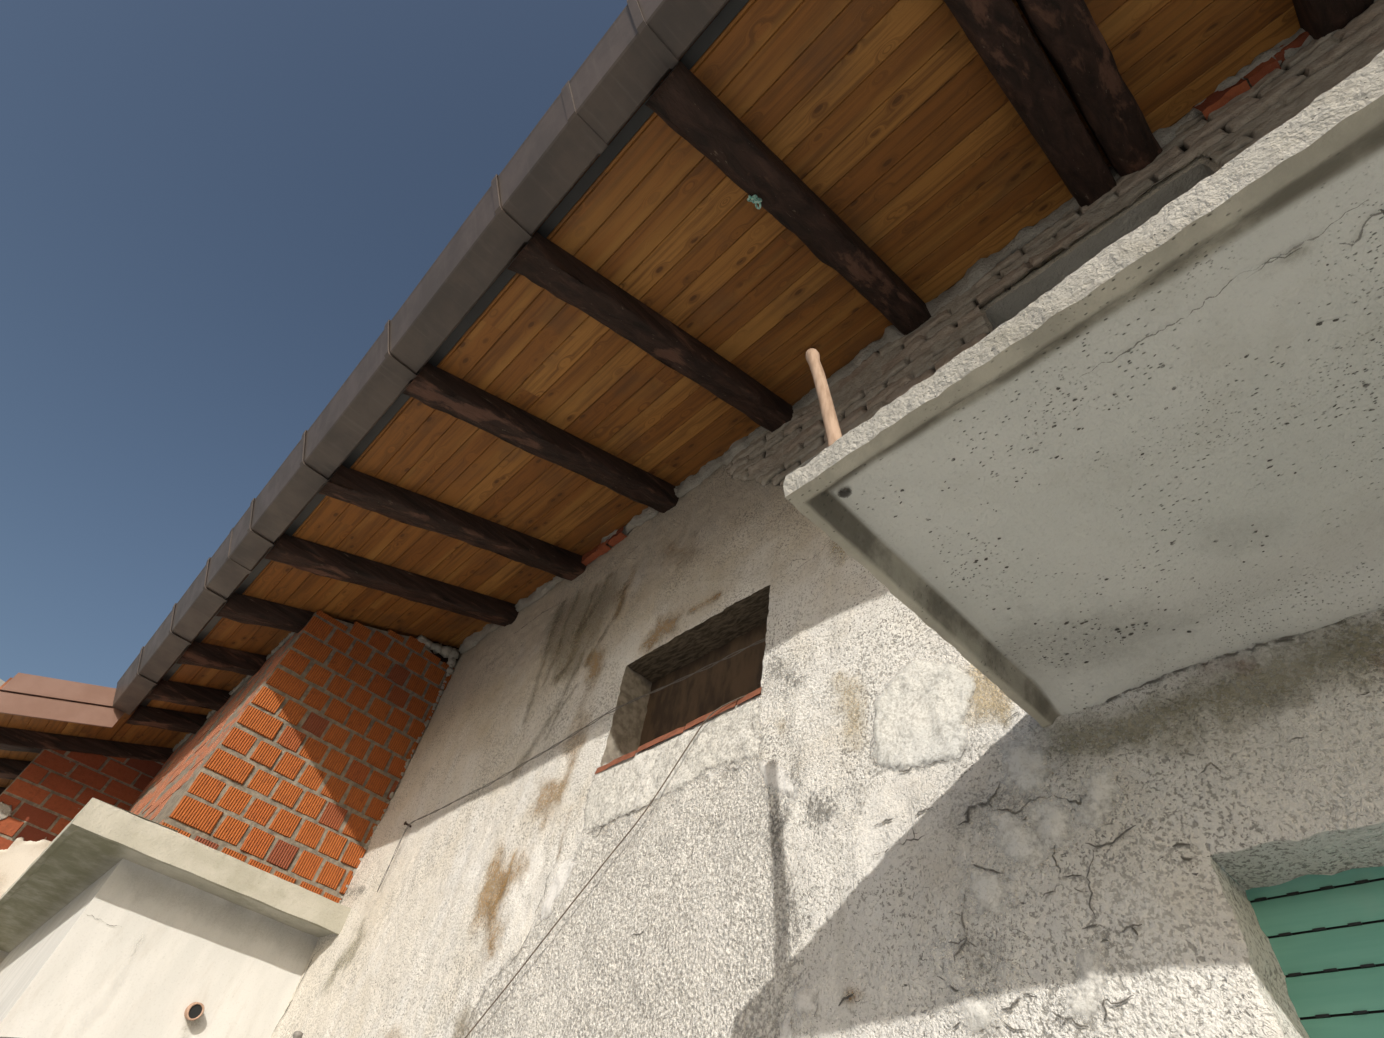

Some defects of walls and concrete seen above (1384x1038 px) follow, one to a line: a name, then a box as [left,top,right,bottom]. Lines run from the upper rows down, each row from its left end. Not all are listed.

crack [1086,200,1384,374]
crack [874,784,1088,855]
crack [1023,825,1142,943]
crack [1172,842,1198,876]
crack [937,864,1134,1032]